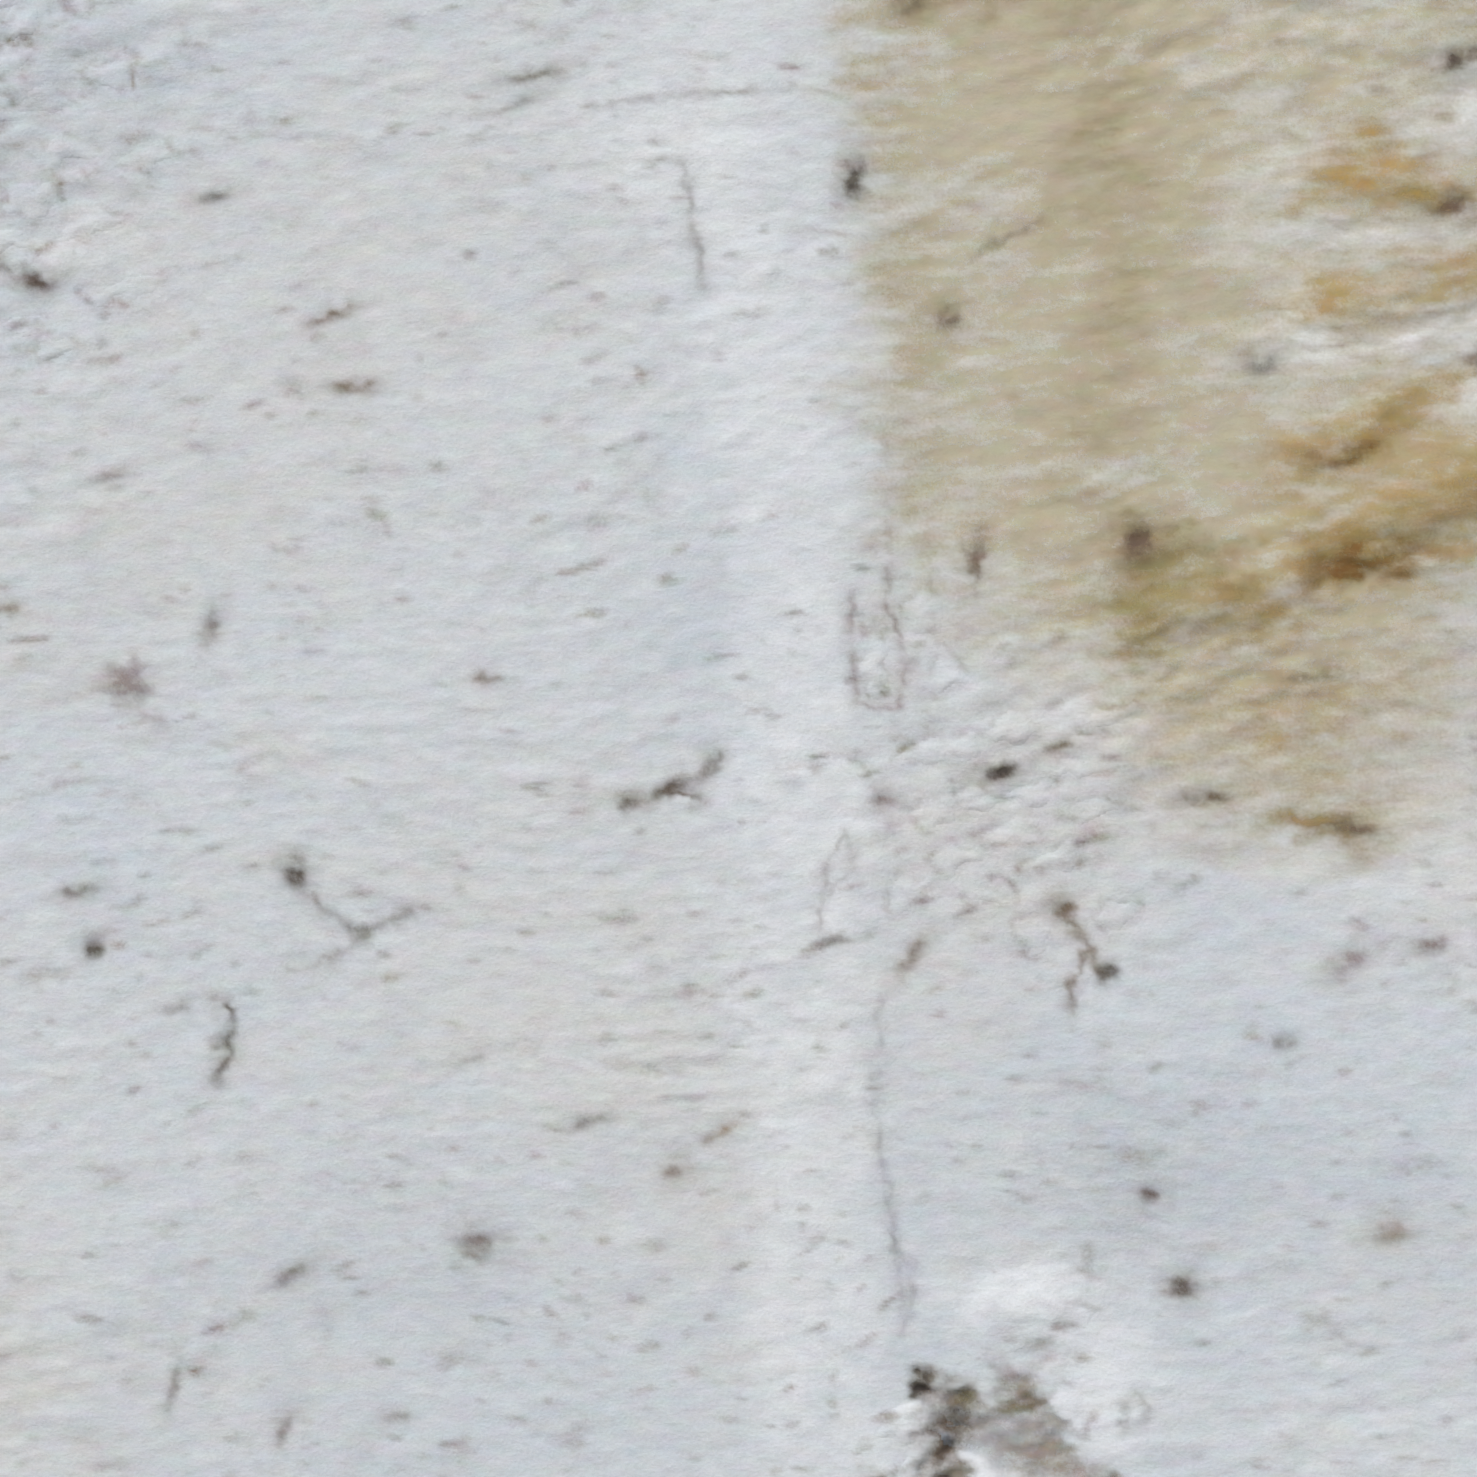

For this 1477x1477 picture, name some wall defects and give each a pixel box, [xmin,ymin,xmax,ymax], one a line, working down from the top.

leakage [1320,128,1429,198]
leakage [1334,386,1441,465]
leakage [1116,528,1245,655]
leakage [1279,811,1349,827]
spalling [877,1368,1087,1477]